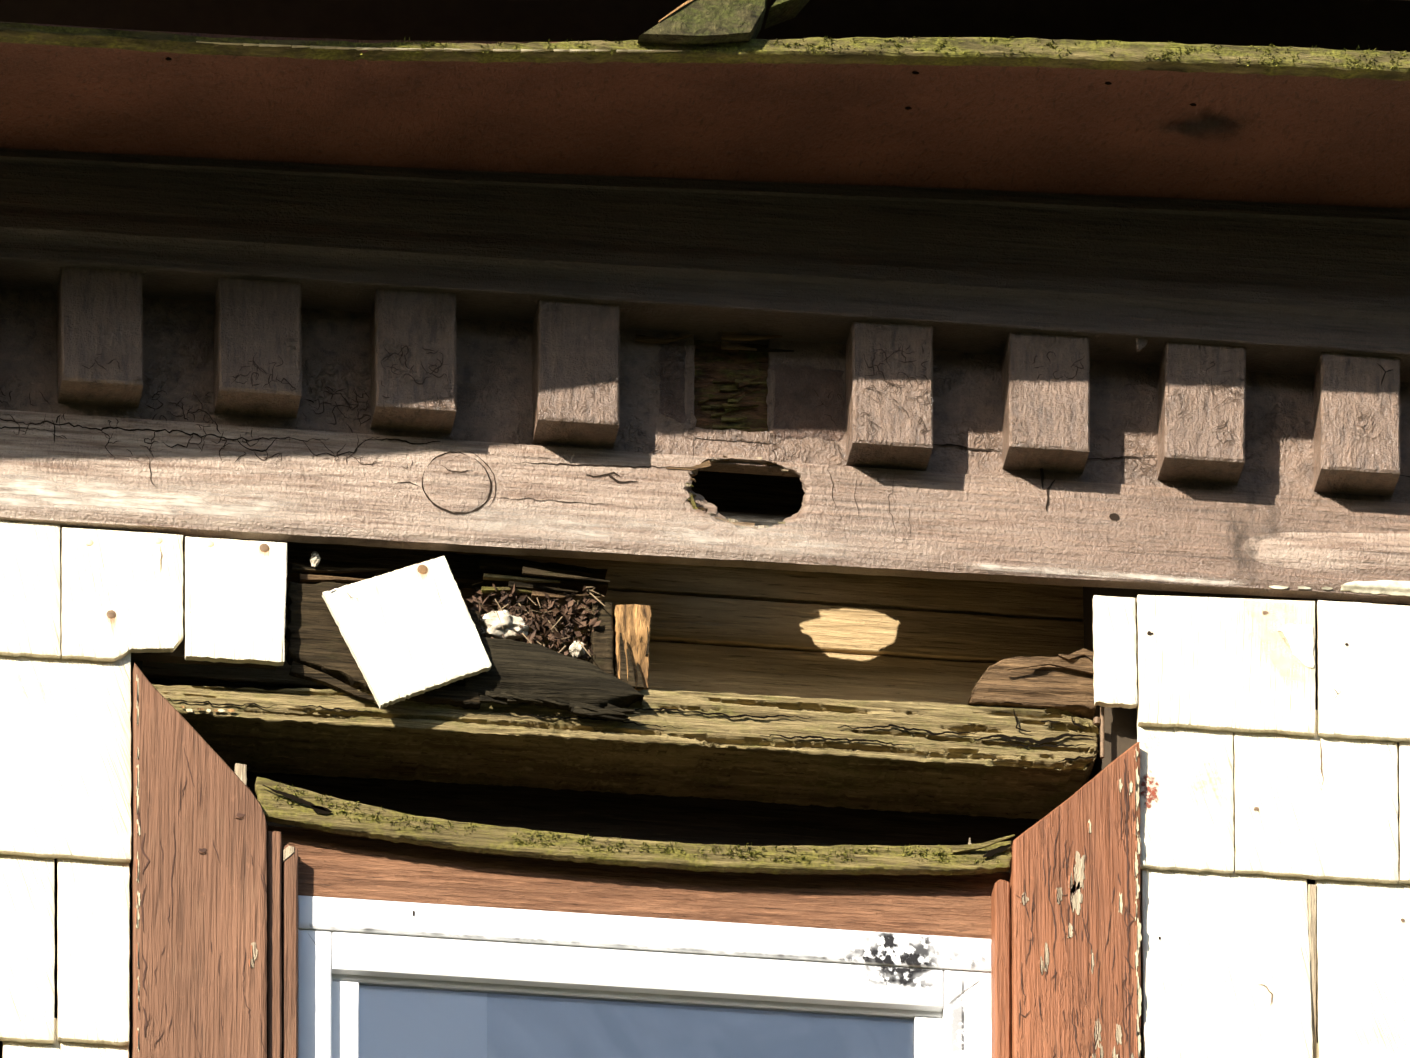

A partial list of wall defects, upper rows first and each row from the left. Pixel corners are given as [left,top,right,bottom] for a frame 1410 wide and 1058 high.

crack [0,345,678,515]
crack [814,344,998,451]
crack [1032,351,1084,381]
crack [1087,453,1153,461]
crack [1202,361,1242,429]
peeling [1055,851,1085,938]
peeling [1090,750,1142,1058]
water stain [742,933,935,987]
peeling [1038,943,1049,975]